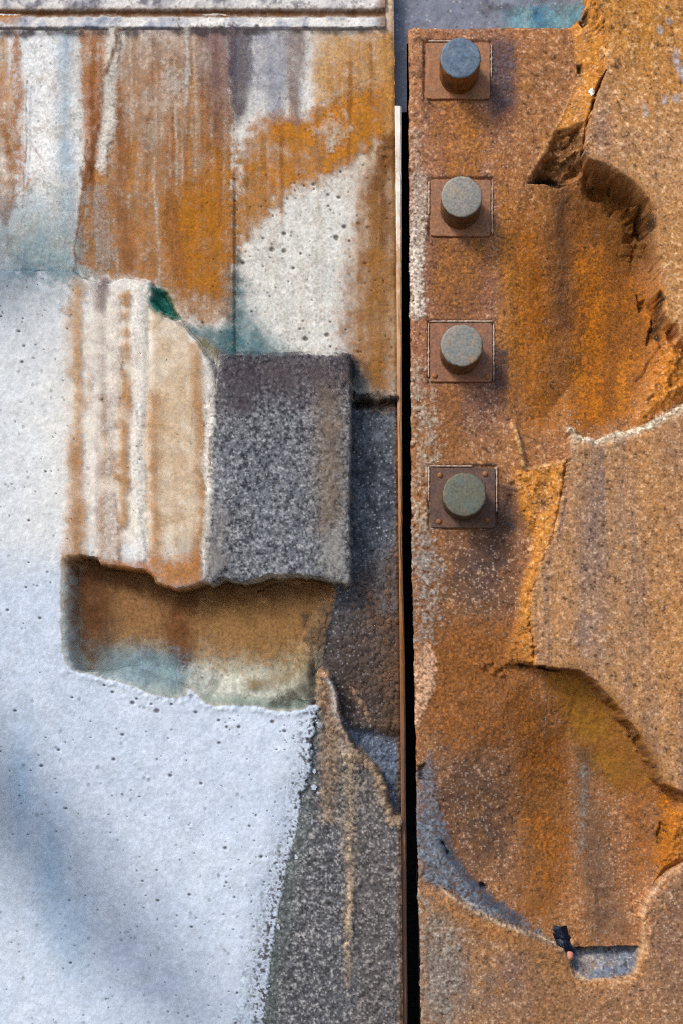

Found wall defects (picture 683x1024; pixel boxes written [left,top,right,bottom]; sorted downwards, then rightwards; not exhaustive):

corrosion [77,30,397,398]
corrosion [428,237,487,320]
corrosion [432,100,489,176]
corrosion [504,159,664,437]
spalling [511,0,683,567]
corrosion [62,284,334,669]
spalling [59,400,403,1024]
corrosion [425,887,571,1018]
spalling [418,669,683,982]
corrosion [424,615,683,918]